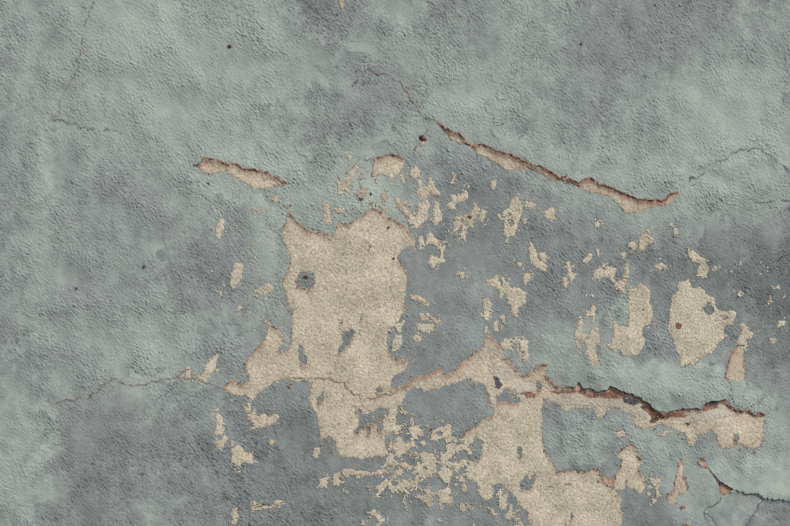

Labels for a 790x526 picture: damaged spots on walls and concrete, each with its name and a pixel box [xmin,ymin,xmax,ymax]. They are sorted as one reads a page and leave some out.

crack [368,67,434,152]
flaking render [434,118,679,213]
crack [689,147,790,186]
peeling [179,349,219,383]
flaking render [193,150,776,526]
crack [703,489,790,526]